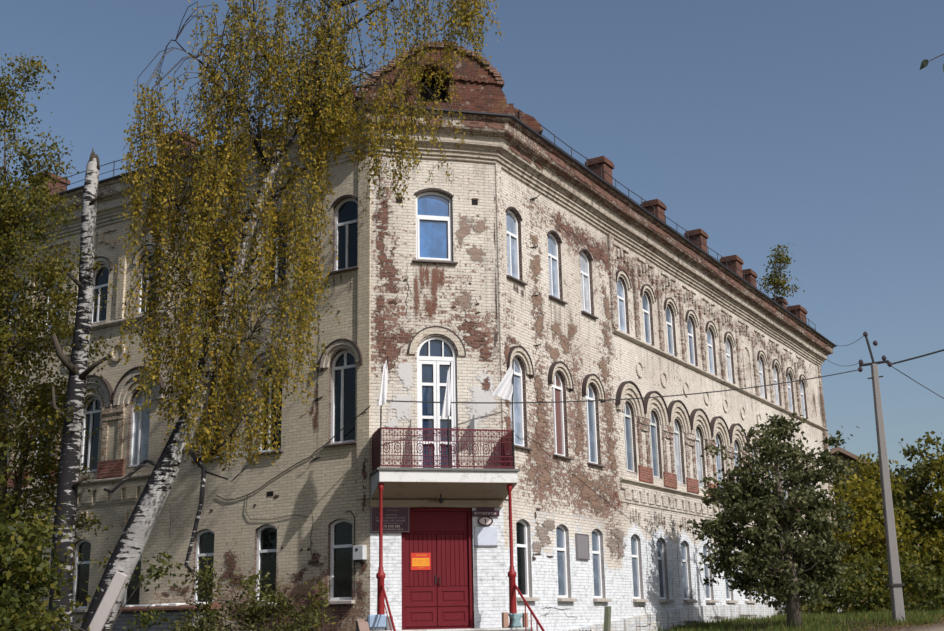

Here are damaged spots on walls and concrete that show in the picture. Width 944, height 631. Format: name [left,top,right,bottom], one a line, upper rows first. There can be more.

spalling [456,198,488,262]
spalling [372,196,415,430]
spalling [529,232,578,362]
spalling [547,210,666,513]
spalling [524,363,557,489]
spalling [219,550,244,586]
spalling [258,548,368,631]
spalling [532,508,556,561]
spalling [607,527,628,567]